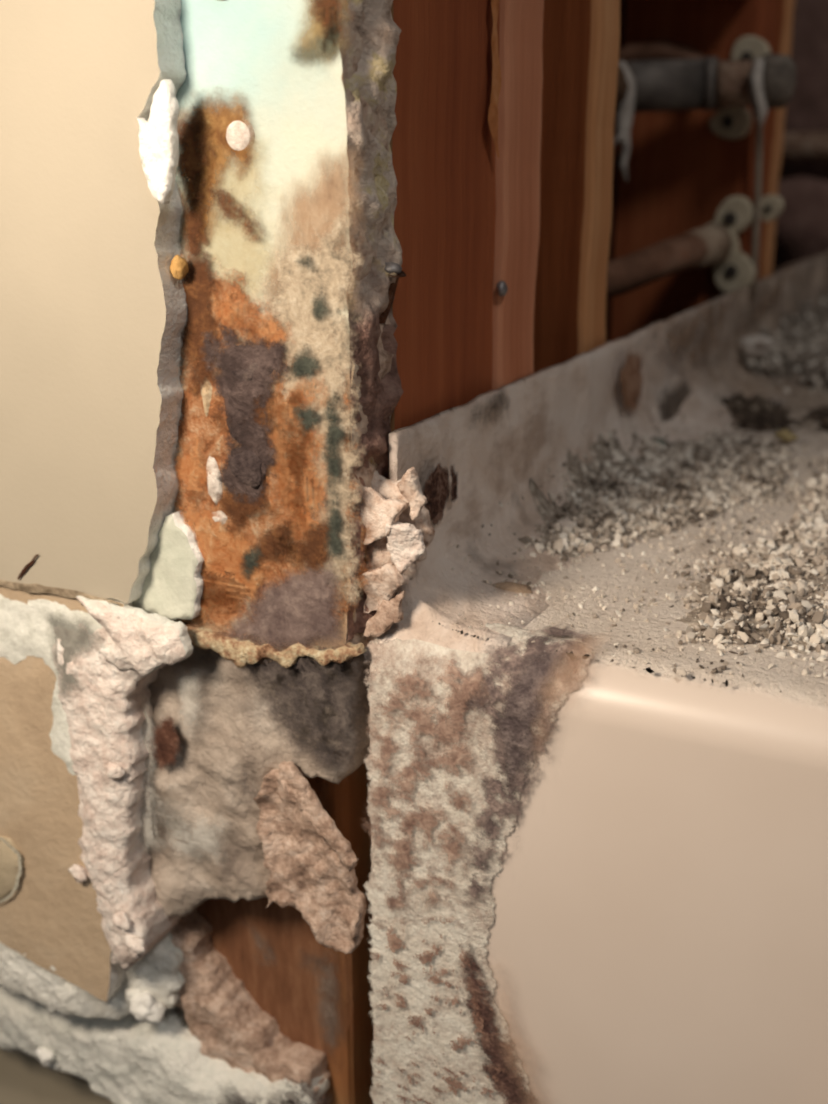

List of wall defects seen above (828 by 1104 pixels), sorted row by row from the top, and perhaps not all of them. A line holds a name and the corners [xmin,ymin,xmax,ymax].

leakage [262,161,362,601]
mould [241,549,260,579]
flaking render [0,594,193,775]
peeling [106,762,126,782]
leakage [314,778,330,816]
peeling [68,864,88,883]
peeling [112,911,148,960]
leakage [196,897,353,1056]
peeling [122,986,167,1023]
peeling [35,1048,55,1067]
leakage [224,1078,327,1104]